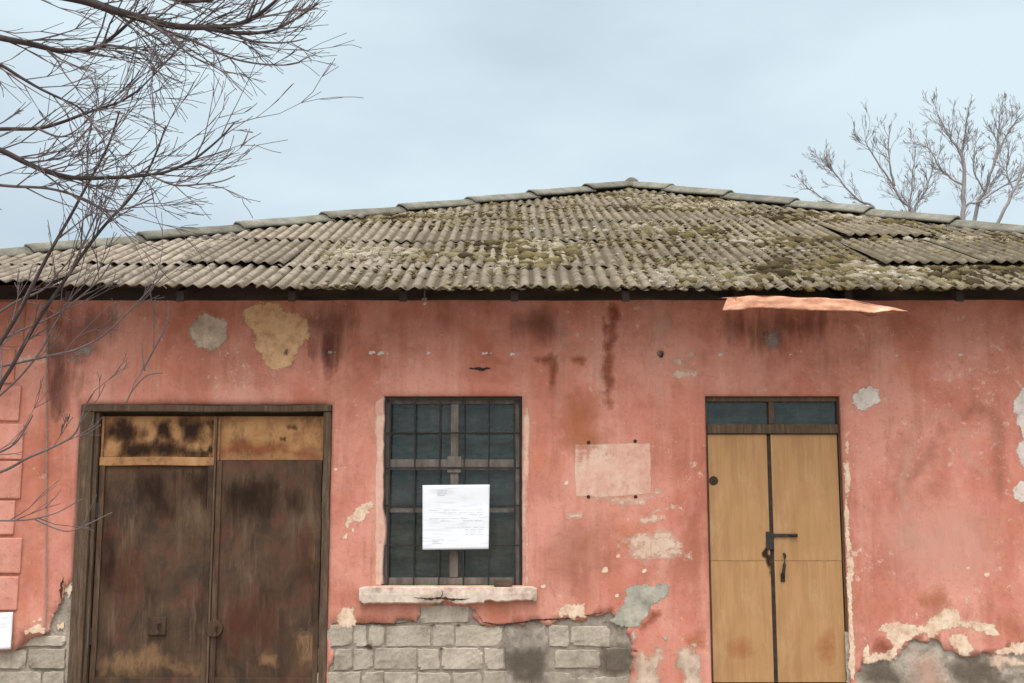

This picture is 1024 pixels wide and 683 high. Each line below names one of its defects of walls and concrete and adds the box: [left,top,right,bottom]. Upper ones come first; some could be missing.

flaking render [242,301,310,371]
flaking render [851,385,881,411]
peeling [1013,387,1024,466]
peeling [343,501,374,539]
peeling [616,505,691,573]
peeling [1013,481,1024,502]
flaking render [0,582,72,683]
crack [355,591,602,625]
flaking render [317,603,702,683]
flaking render [845,597,1024,683]